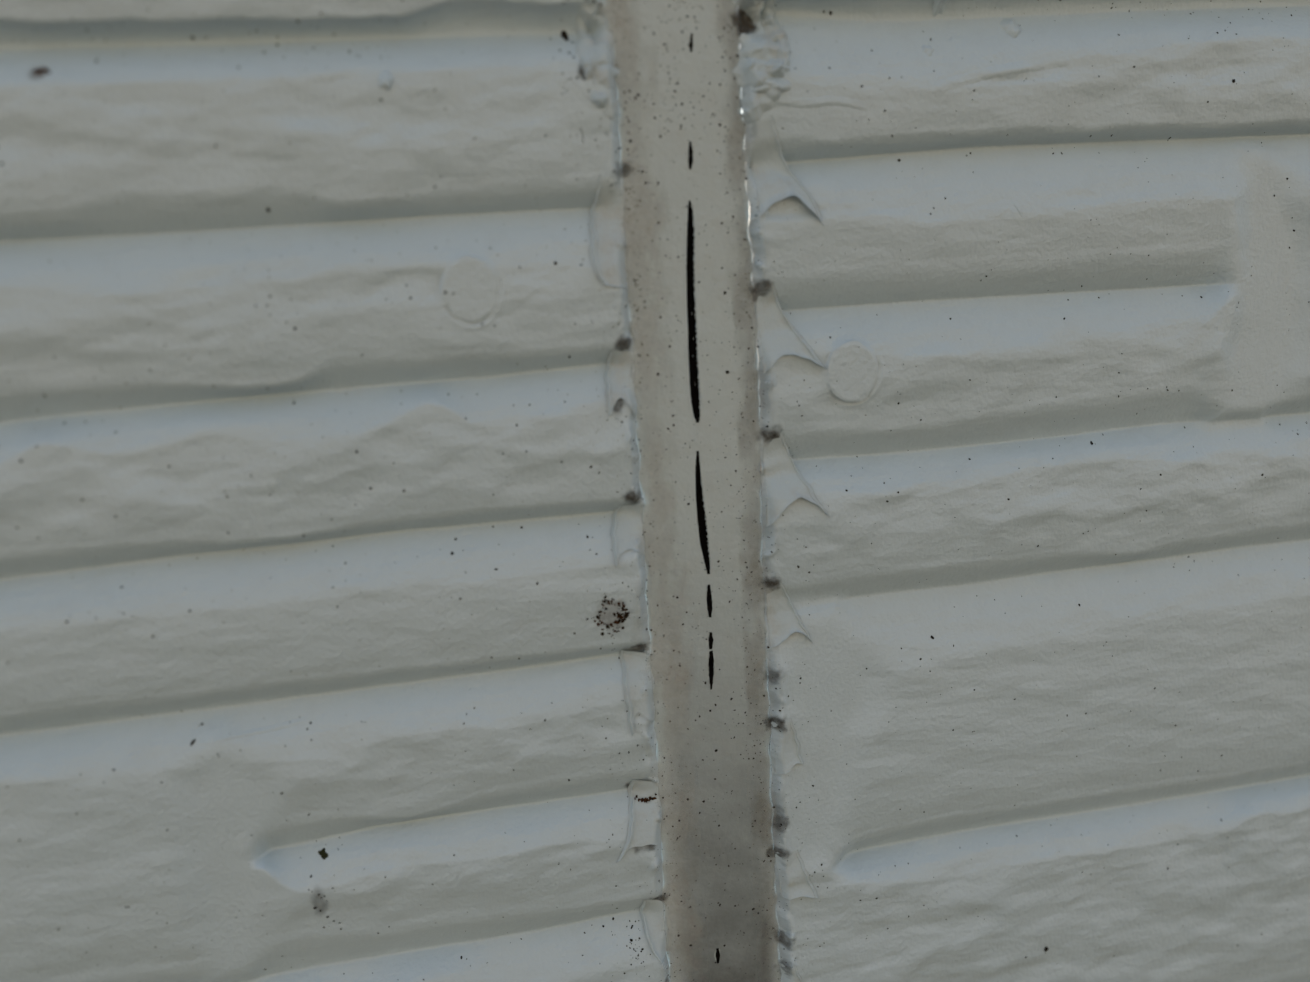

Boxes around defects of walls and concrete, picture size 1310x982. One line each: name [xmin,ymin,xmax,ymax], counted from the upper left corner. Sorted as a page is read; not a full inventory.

crack [686,141,694,169]
peeling [749,115,824,226]
peeling [588,175,626,289]
peeling [756,282,828,373]
peeling [603,350,636,420]
crack [685,200,714,712]
peeling [763,431,830,526]
peeling [610,505,645,568]
peeling [765,581,812,648]
peeling [619,650,655,735]
peeling [616,779,661,863]
crack [714,948,722,963]